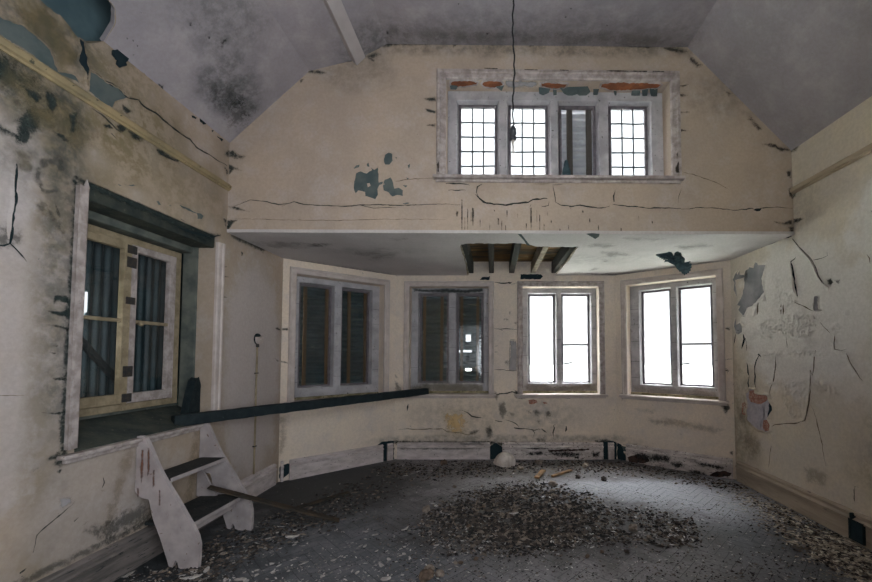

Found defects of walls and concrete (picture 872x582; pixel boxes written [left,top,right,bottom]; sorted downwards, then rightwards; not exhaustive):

leakage [0,56,57,143]
peeling [0,15,130,108]
crack [91,65,229,166]
peeling [539,70,664,97]
crack [0,164,27,262]
peeling [352,151,410,204]
crack [232,172,784,221]
peeling [731,261,767,336]
peeling [813,279,839,312]
crack [769,236,863,464]
spalling [742,387,776,435]